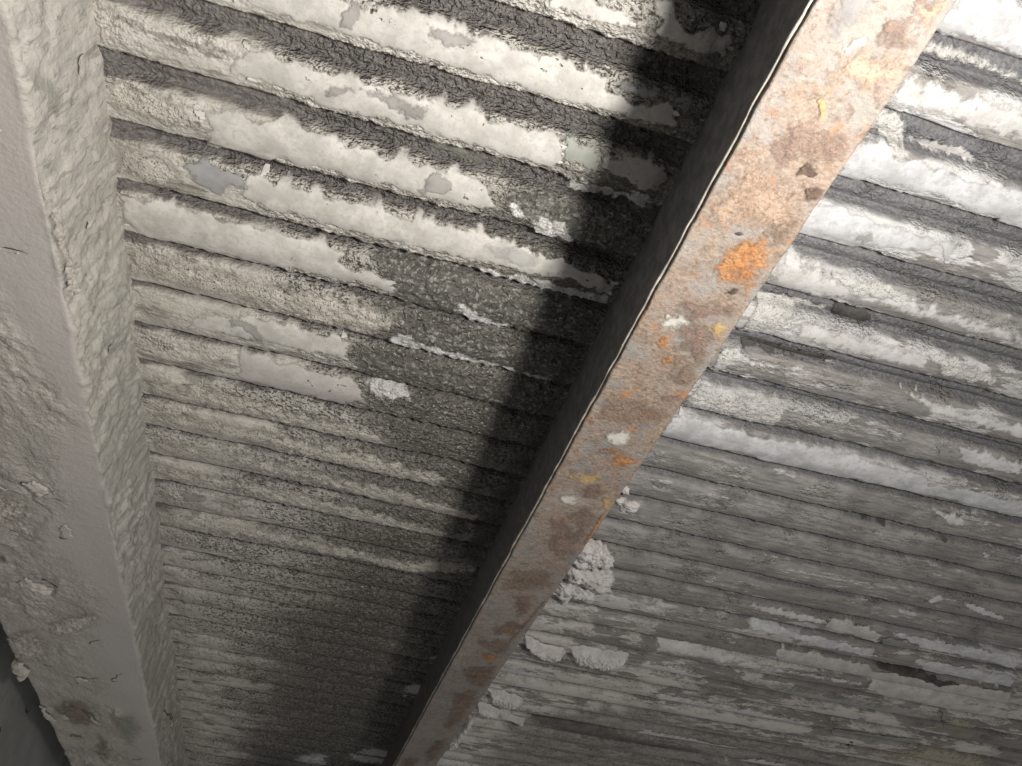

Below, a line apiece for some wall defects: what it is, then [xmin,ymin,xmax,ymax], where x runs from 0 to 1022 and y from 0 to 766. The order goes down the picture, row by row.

peeling [234,0,692,127]
corrosion [830,21,911,89]
peeling [937,0,1022,56]
peeling [231,39,668,191]
peeling [120,104,619,296]
corrosion [713,172,793,230]
peeling [838,135,1022,228]
corrosion [717,238,767,290]
corrosion [657,301,734,401]
corrosion [553,473,611,544]
peeling [662,406,1022,517]
peeling [637,602,1018,718]